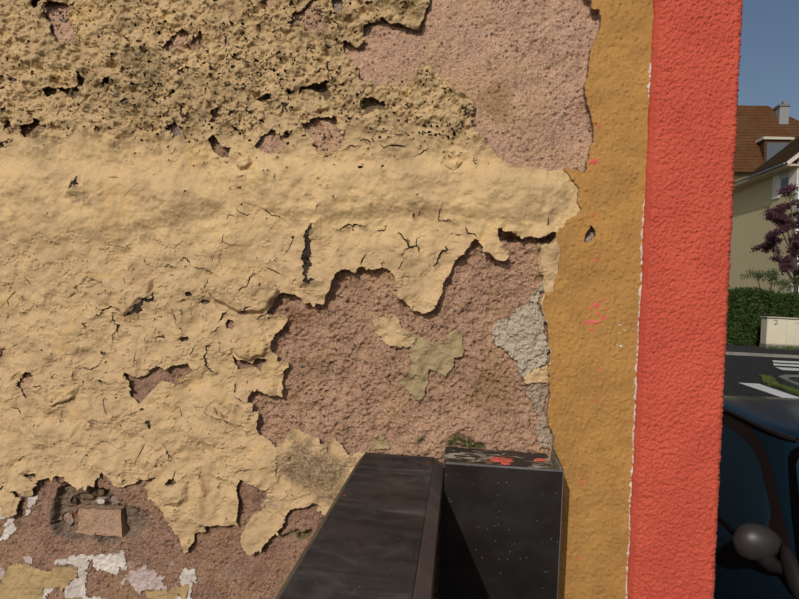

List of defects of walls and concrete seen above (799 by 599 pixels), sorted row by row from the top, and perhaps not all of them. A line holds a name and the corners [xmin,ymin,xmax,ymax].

peeling [164,27,205,61]
peeling [44,74,116,104]
peeling [299,66,341,100]
peeling [341,0,599,172]
peeling [0,107,54,148]
peeling [208,100,258,159]
peeling [248,114,345,158]
crack [340,224,420,279]
crack [418,209,477,267]
crack [190,223,314,372]
peeling [248,228,556,476]
peeling [0,473,325,599]